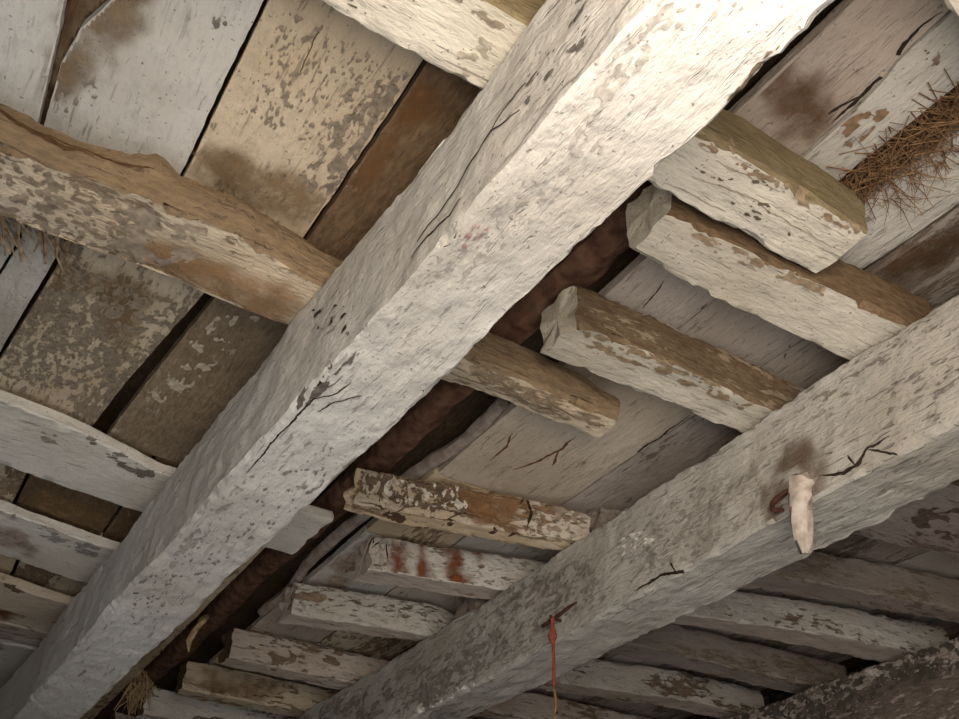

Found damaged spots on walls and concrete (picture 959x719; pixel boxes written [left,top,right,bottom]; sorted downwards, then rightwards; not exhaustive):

water stain [68,0,138,34]
water stain [52,48,90,94]
peeling [241,13,409,195]
crack [411,0,630,258]
peeling [0,144,208,266]
water stain [188,151,326,219]
crack [247,375,359,473]
crack [820,436,899,476]
spalling [359,471,471,515]
rust [392,546,405,574]
rust [417,546,427,577]
rust [440,547,481,583]